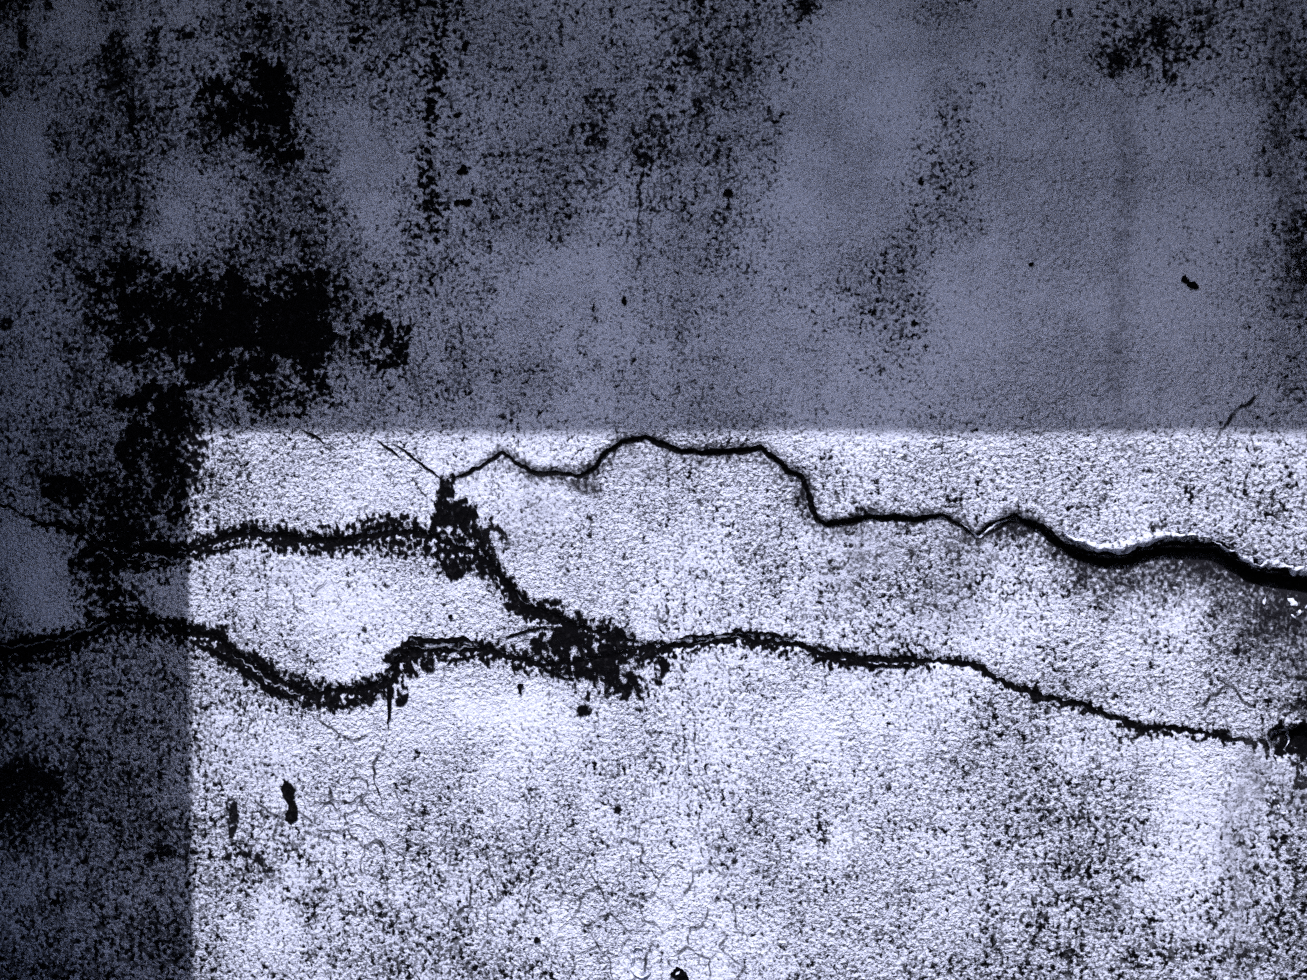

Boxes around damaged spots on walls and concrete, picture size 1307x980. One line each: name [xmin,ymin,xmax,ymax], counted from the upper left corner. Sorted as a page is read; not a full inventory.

water stain [126,93,139,130]
water stain [43,120,66,155]
water stain [46,191,62,206]
mould [0,317,14,330]
water stain [36,233,412,626]
crack [299,430,327,446]
crack [0,433,1307,980]